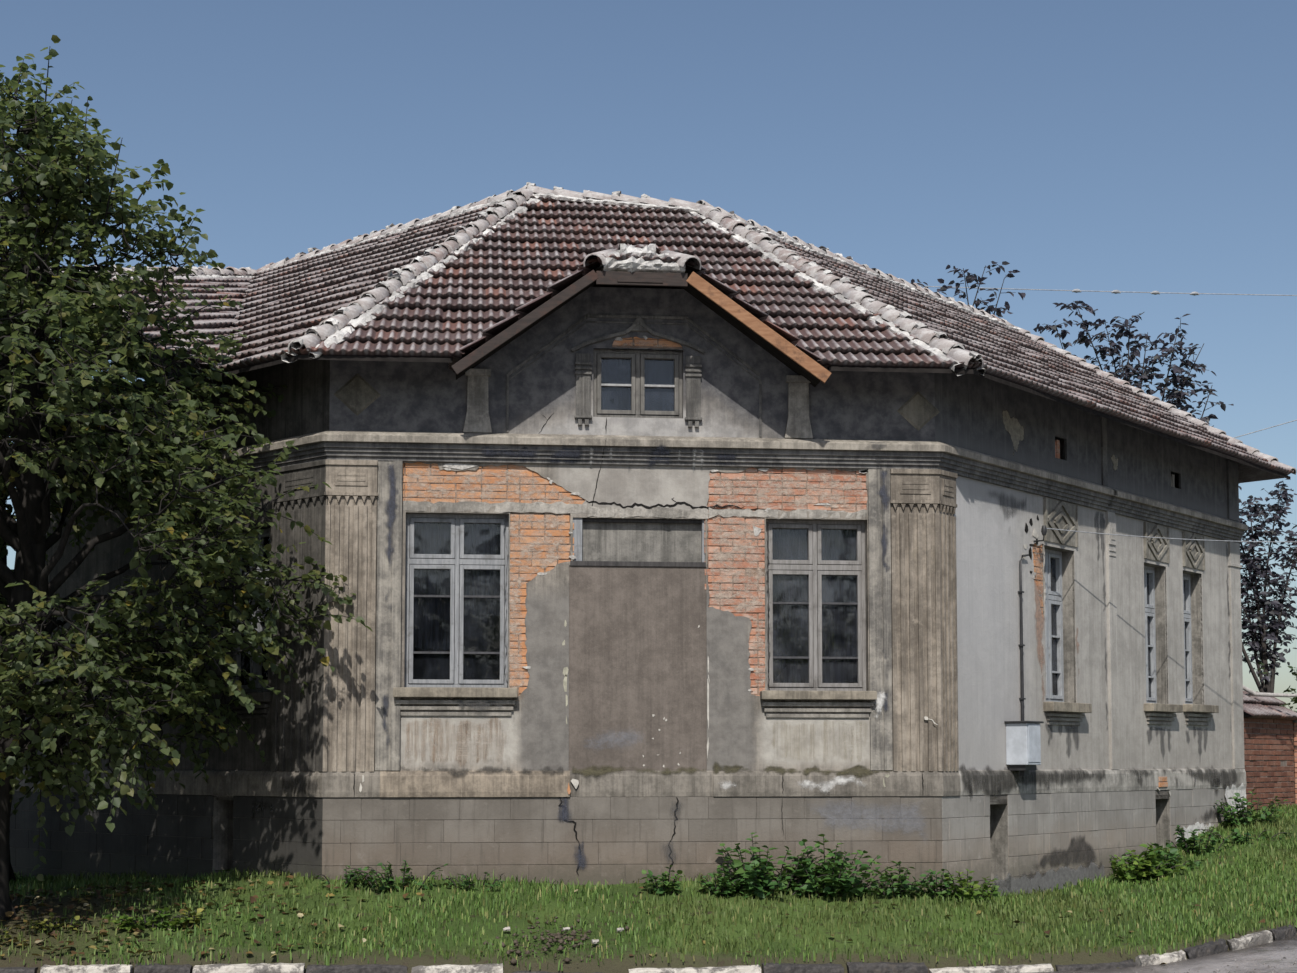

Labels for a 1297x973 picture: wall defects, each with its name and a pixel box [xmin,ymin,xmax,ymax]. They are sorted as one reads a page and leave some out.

spalling [612,336,683,349]
crack [587,417,744,509]
flaking render [1003,410,1024,455]
spalling [402,462,585,695]
spalling [704,467,868,696]
water stain [960,766,1105,794]
water stain [1177,729,1237,793]
crack [558,798,581,875]
crack [668,797,679,869]